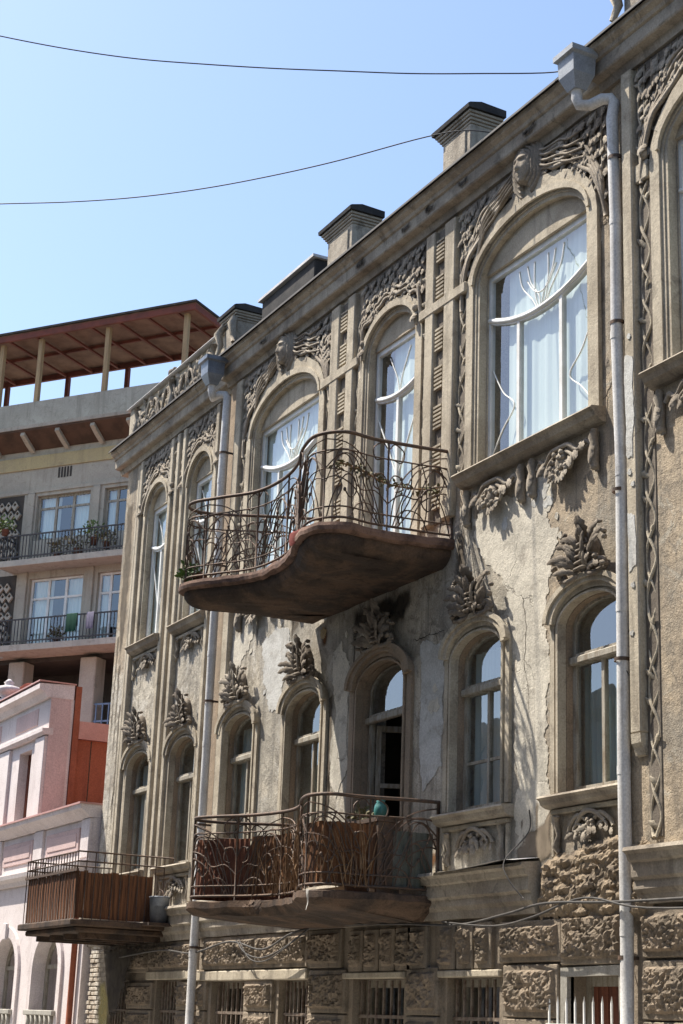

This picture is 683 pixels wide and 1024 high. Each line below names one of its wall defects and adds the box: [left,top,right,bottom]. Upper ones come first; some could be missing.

peeling [231,621,294,712]
peeling [471,477,563,853]